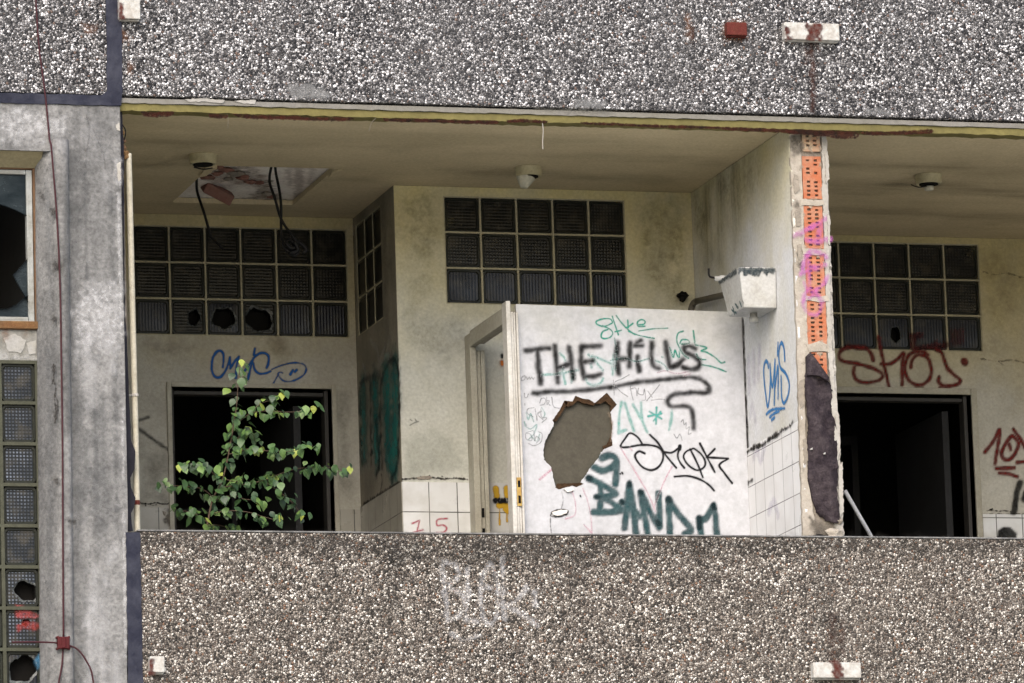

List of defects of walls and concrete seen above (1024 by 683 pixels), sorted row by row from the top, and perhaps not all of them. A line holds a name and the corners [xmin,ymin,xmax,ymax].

corrosion [805,23,823,107]
spalling [199,165,277,200]
spalling [552,393,617,422]
flaking render [797,379,805,409]
spalling [555,483,584,492]
flaking render [809,414,844,534]
corrosion [829,661,844,678]